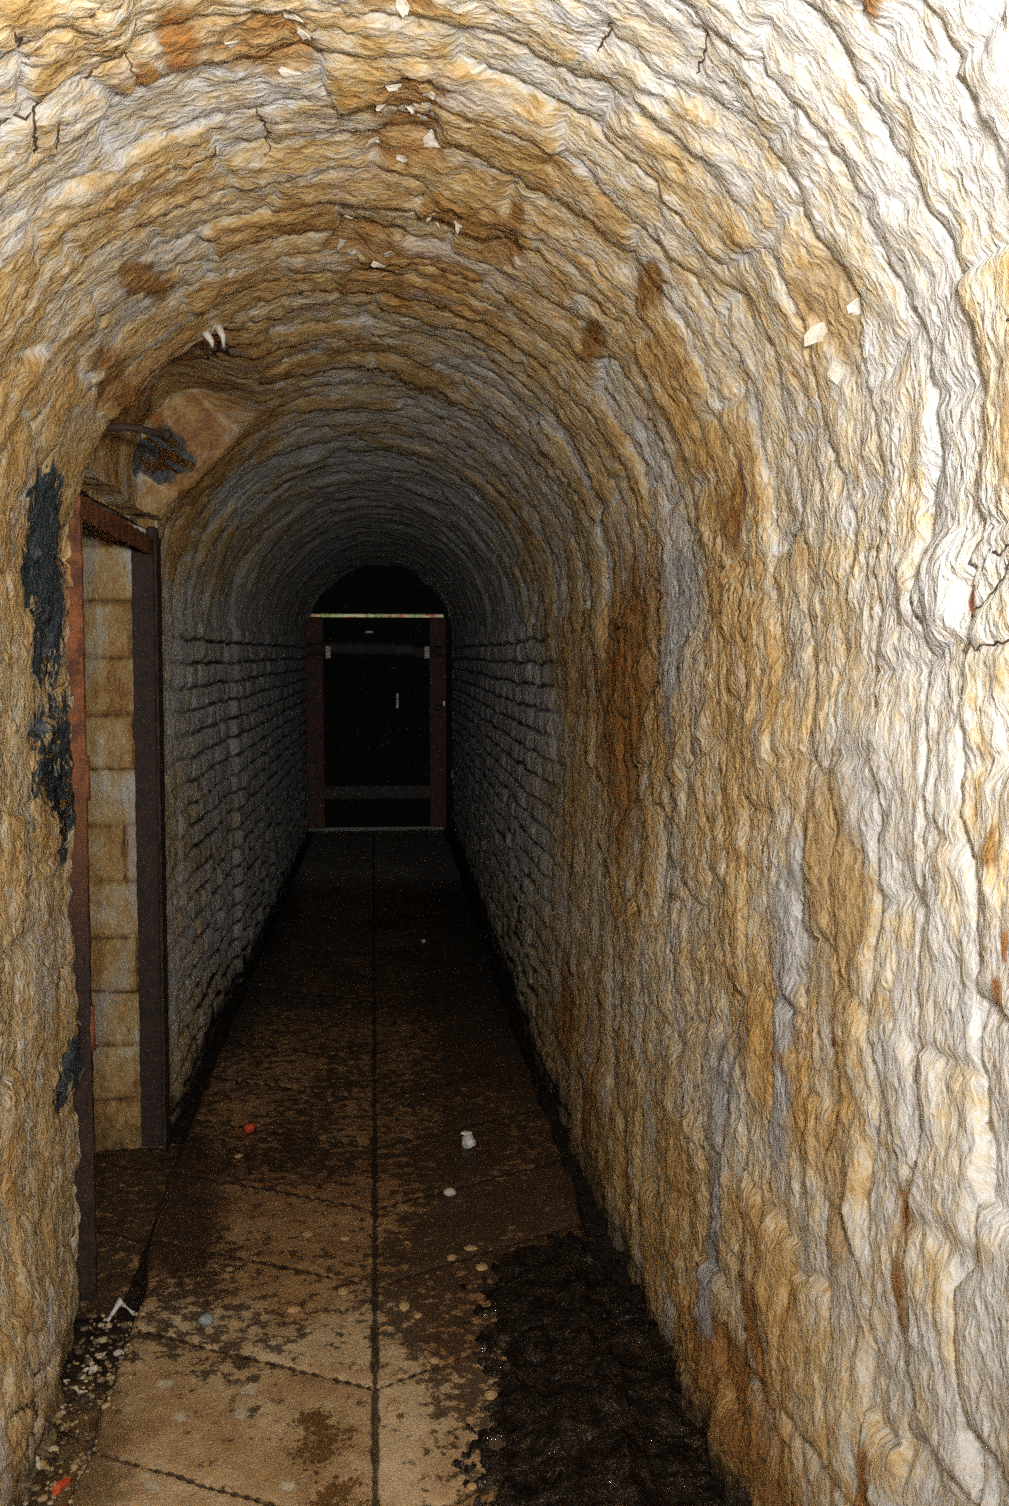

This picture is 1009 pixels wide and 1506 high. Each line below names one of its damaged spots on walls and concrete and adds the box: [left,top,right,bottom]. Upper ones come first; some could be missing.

crack [597,22,613,52]
crack [696,27,709,74]
peeling [131,421,197,485]
damp [660,554,698,733]
damp [768,758,864,1167]
damp [826,1137,850,1265]